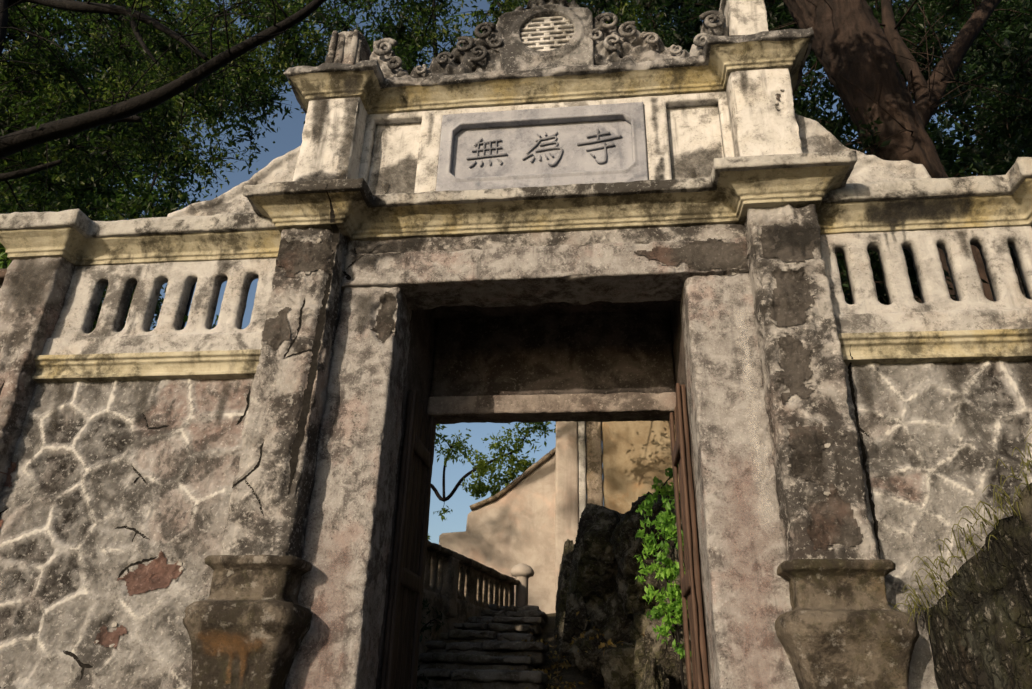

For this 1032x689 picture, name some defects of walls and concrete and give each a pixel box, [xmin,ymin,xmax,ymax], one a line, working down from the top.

crack [284,184,382,494]
crack [236,389,251,425]
spalling [0,461,17,488]
crack [232,439,264,516]
crack [848,346,881,559]
spalling [117,551,185,596]
spalling [94,622,127,649]
crack [63,651,93,680]